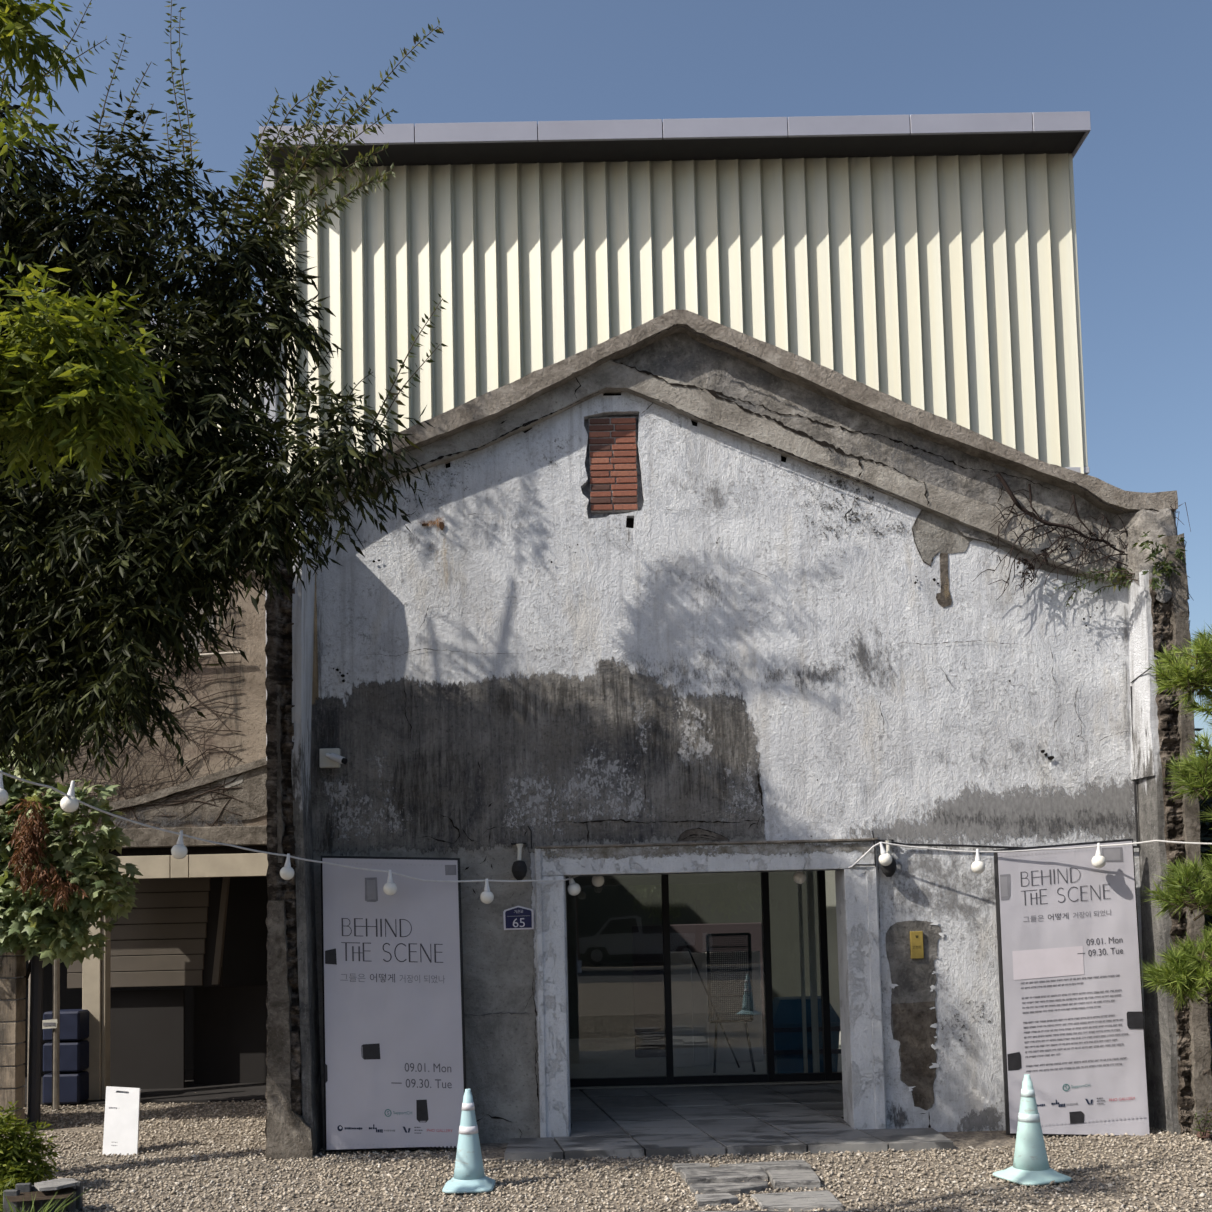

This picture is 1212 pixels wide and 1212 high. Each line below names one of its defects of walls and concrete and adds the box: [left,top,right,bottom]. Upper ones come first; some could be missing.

crack [653,324,767,364]
corrosion [420,518,444,530]
crack [322,378,597,543]
damp [795,447,920,556]
crack [613,361,1173,531]
flaking render [912,510,973,607]
peeling [988,543,1094,579]
damp [845,773,1138,852]
peeling [886,843,995,1110]